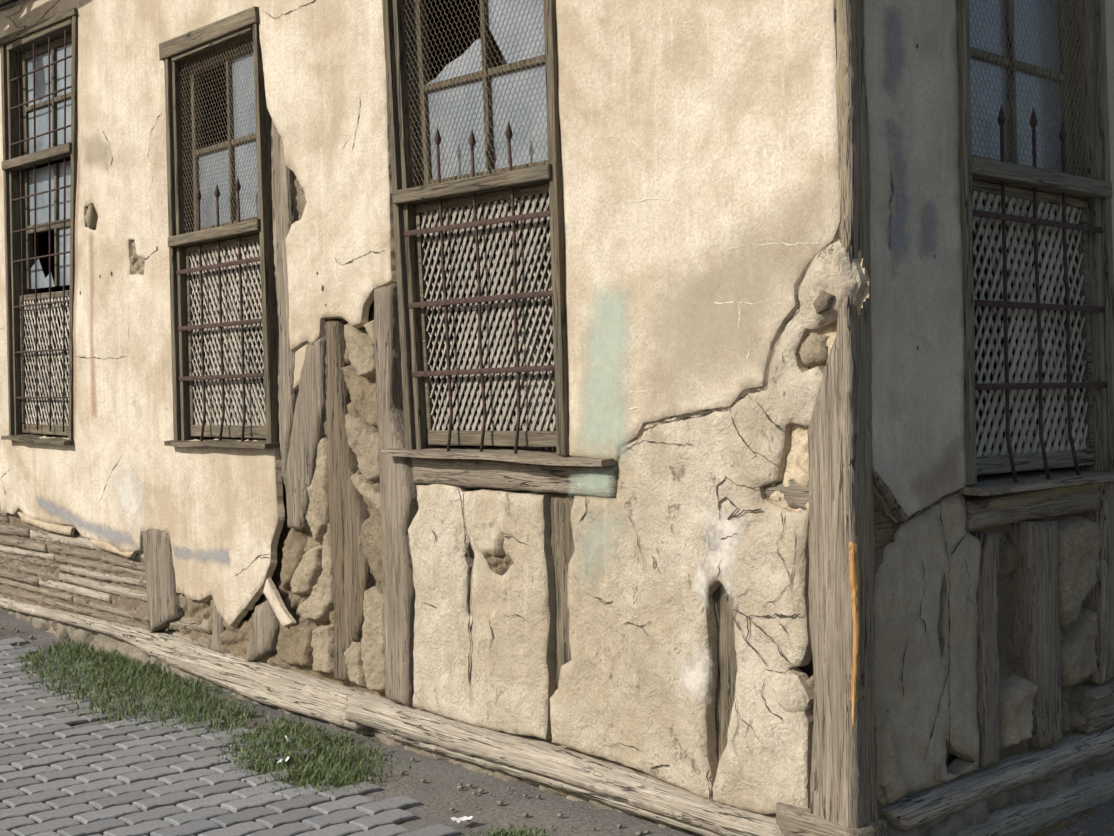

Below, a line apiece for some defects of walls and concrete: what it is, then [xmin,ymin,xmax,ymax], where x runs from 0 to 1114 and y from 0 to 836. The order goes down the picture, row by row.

crack [617,264,811,465]
spalling [0,506,149,626]
spalling [176,310,386,696]
crack [584,592,651,637]
crack [706,476,801,802]
spalling [968,523,1039,759]
spalling [1028,512,1101,737]
crack [551,743,669,780]